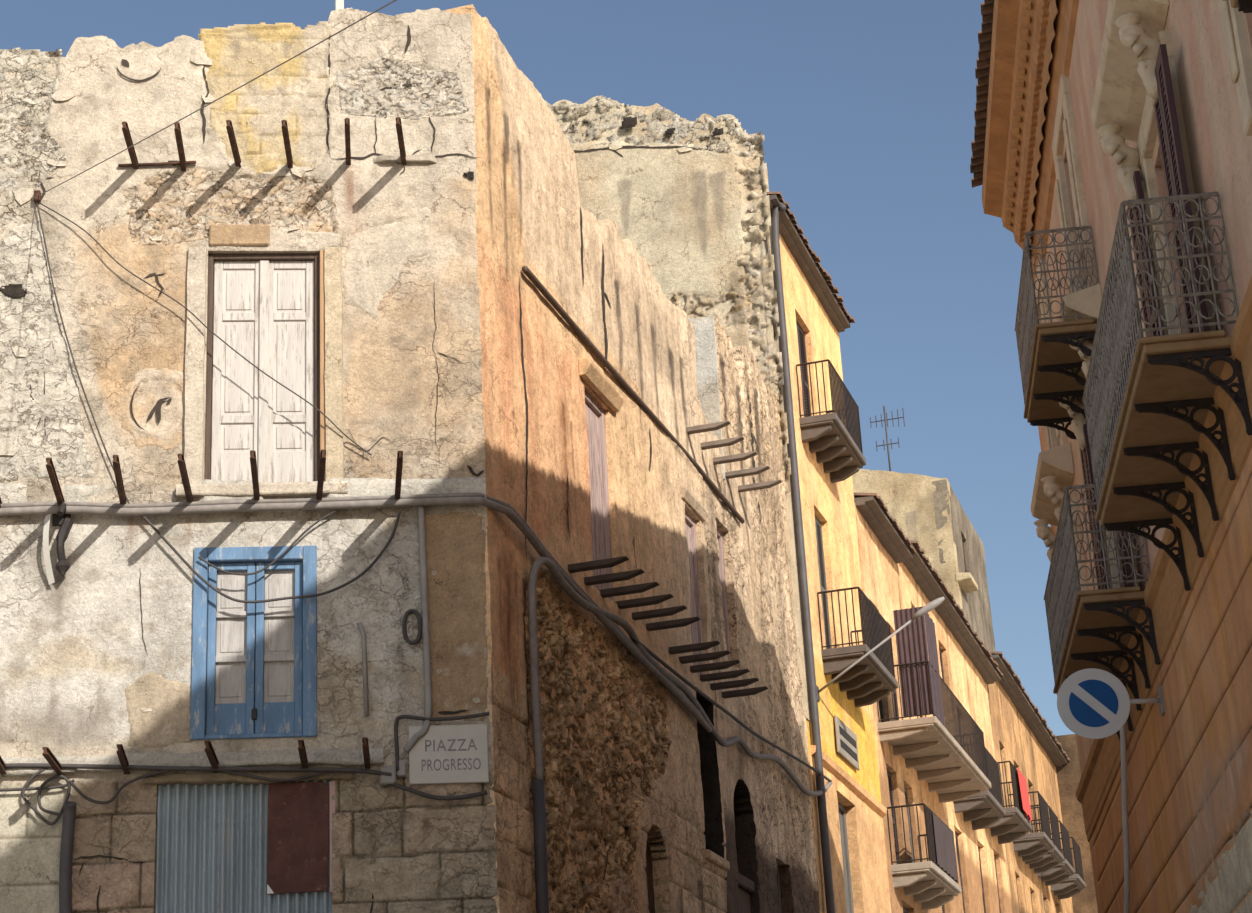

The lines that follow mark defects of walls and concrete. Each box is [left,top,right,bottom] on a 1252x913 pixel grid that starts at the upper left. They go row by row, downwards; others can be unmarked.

spalling [0,47,76,205]
spalling [123,21,469,319]
peeling [0,216,95,483]
spalling [523,569,672,913]
spalling [1190,809,1252,913]